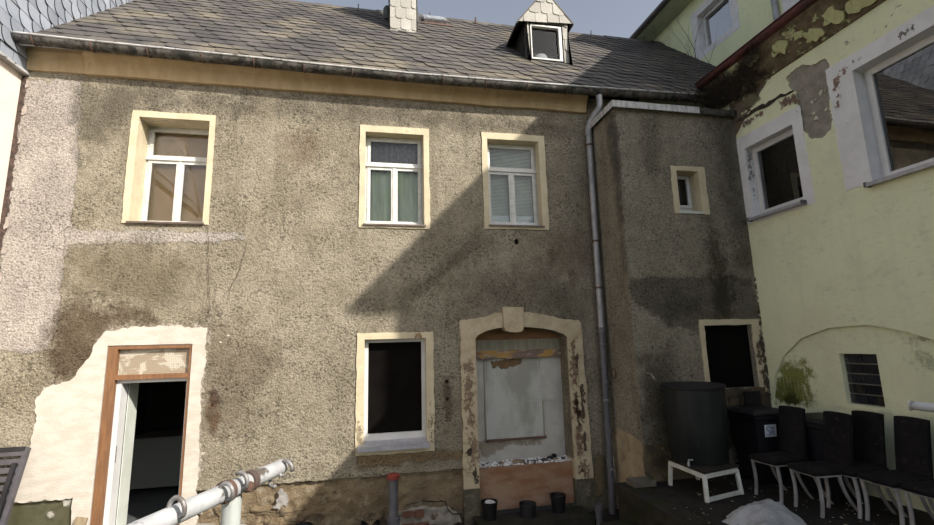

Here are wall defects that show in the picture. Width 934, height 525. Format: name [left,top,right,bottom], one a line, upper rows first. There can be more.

peeling [771,0,876,57]
flaking render [778,57,861,139]
damp [49,304,154,380]
peeling [459,359,481,484]
peeling [566,337,591,486]
spalling [241,492,356,525]
spalling [398,505,462,525]